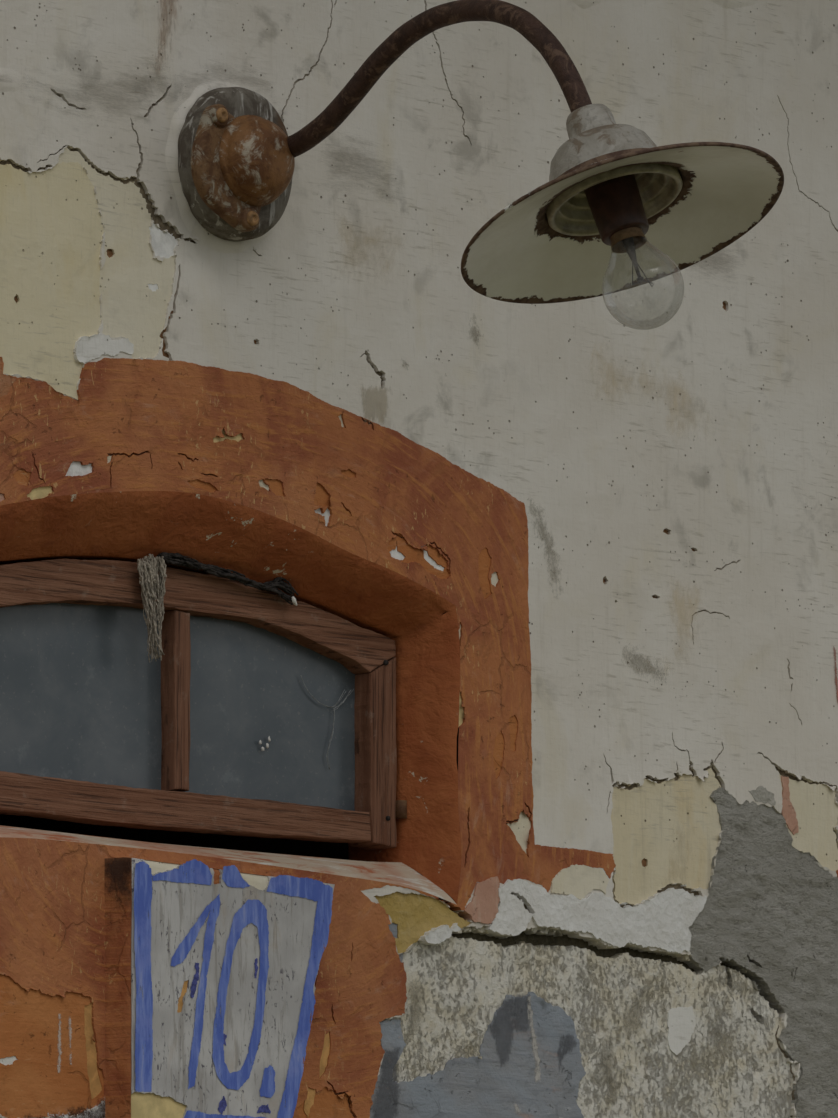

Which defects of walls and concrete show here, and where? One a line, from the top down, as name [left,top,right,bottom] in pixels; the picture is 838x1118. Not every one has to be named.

peeling [0,146,178,400]
crack [0,146,196,244]
crack [108,450,147,458]
peeling [297,1032,354,1118]
spalling [370,765,797,1118]
crack [452,893,795,1117]